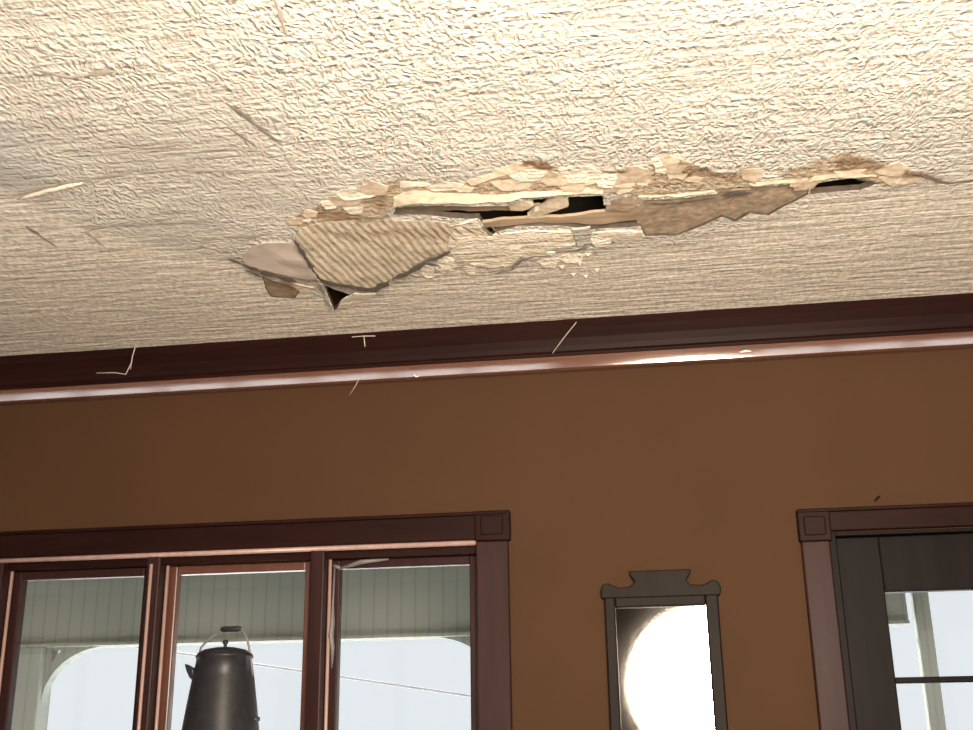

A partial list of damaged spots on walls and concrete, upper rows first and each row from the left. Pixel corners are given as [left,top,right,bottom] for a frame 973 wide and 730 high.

crack [33,69,117,79]
crack [0,143,276,204]
crack [911,173,973,184]
crack [26,226,57,247]
crack [84,221,274,249]
peeling [227,155,929,311]